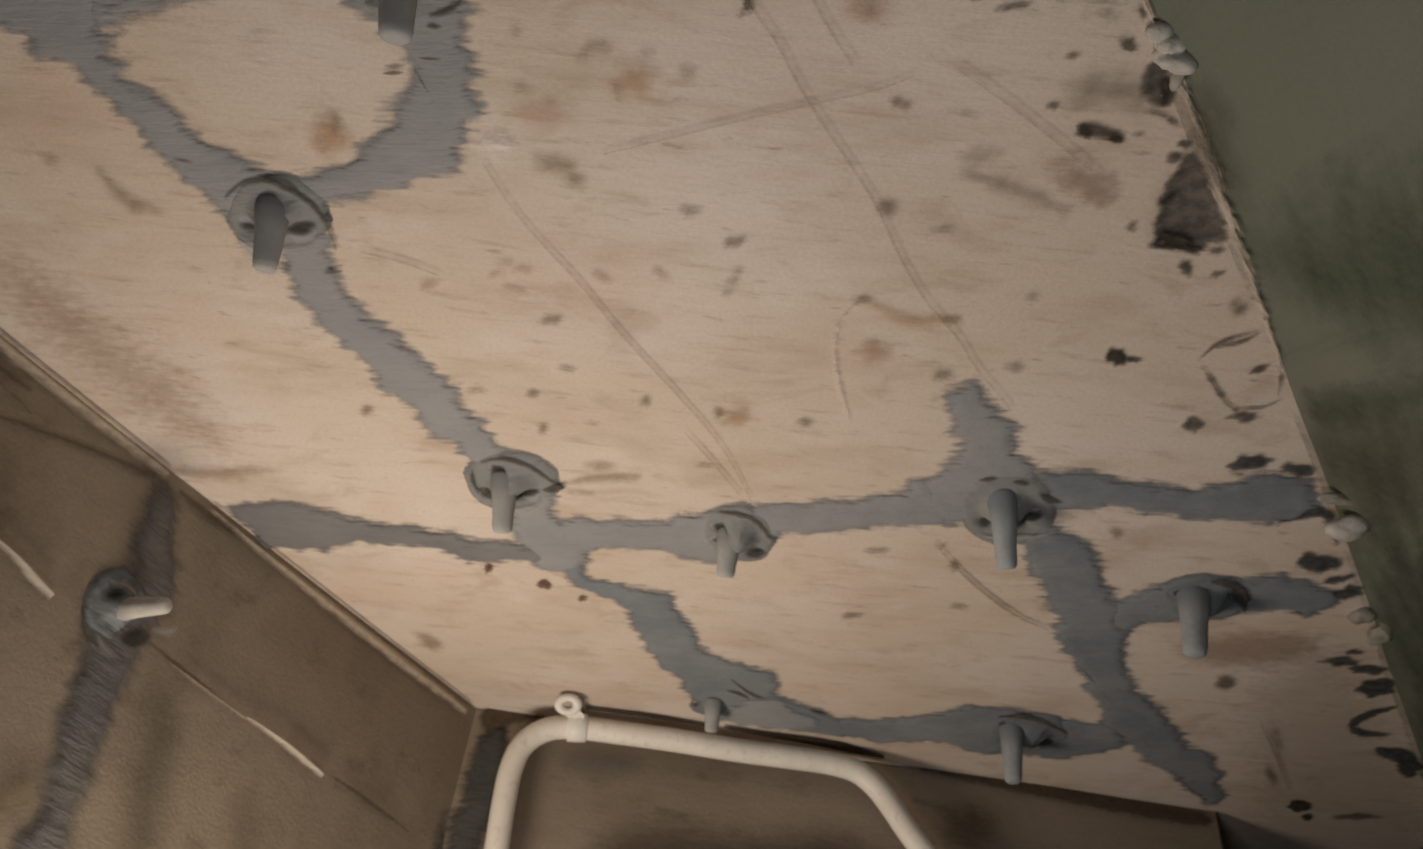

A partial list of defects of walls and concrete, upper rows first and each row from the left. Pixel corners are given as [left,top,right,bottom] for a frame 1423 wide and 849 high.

crack [0,0,266,231]
crack [281,0,508,471]
crack [0,366,1340,849]